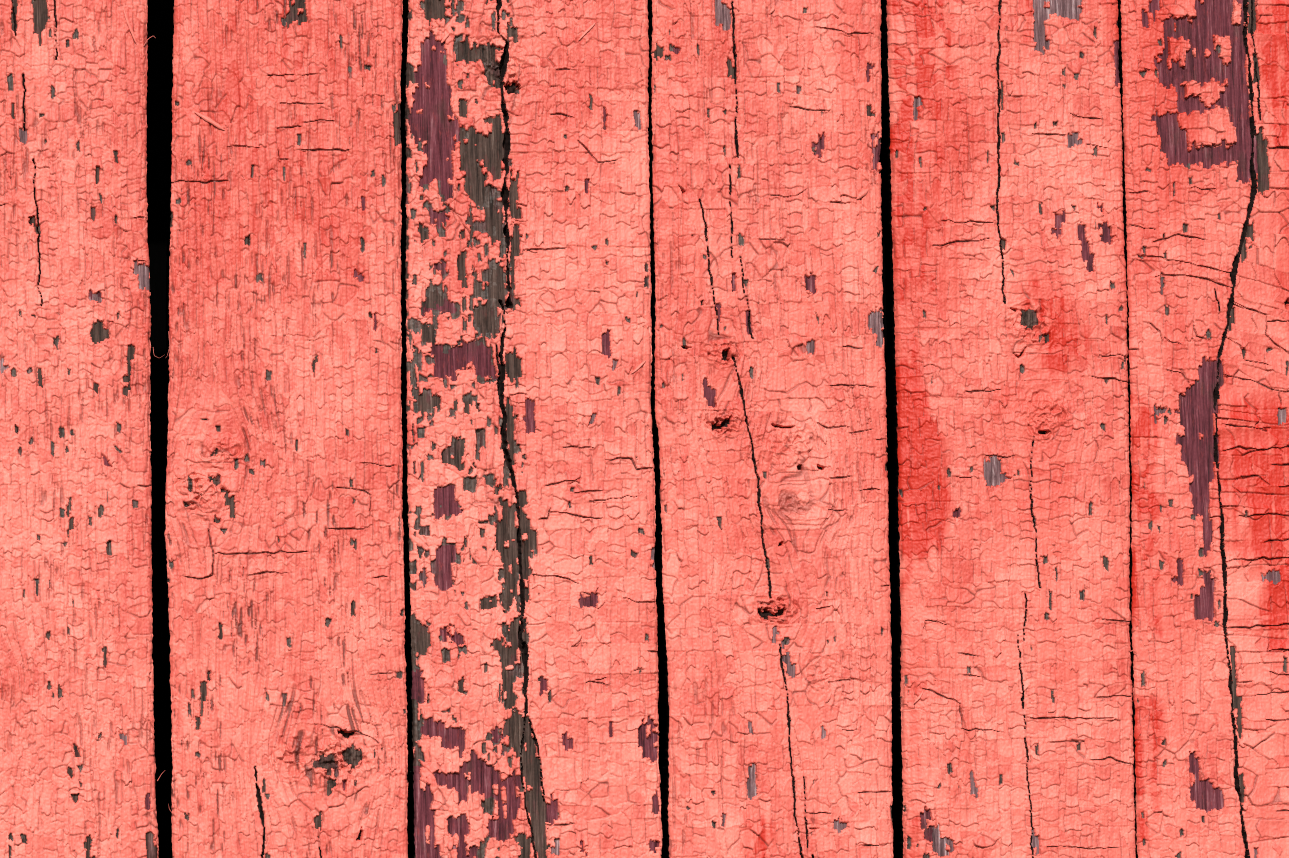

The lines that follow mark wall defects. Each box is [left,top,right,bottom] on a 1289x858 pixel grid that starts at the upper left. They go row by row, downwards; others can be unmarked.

peeling [384,0,560,858]
crack [496,0,657,858]
crack [699,2,786,598]
crack [932,0,1006,304]
peeling [1017,0,1083,55]
crack [1097,0,1289,858]
peeling [1154,358,1252,630]
peeling [1142,0,1280,198]
peeling [562,732,573,751]
crack [779,644,832,858]
crack [922,441,1133,858]
peeling [1186,752,1245,818]